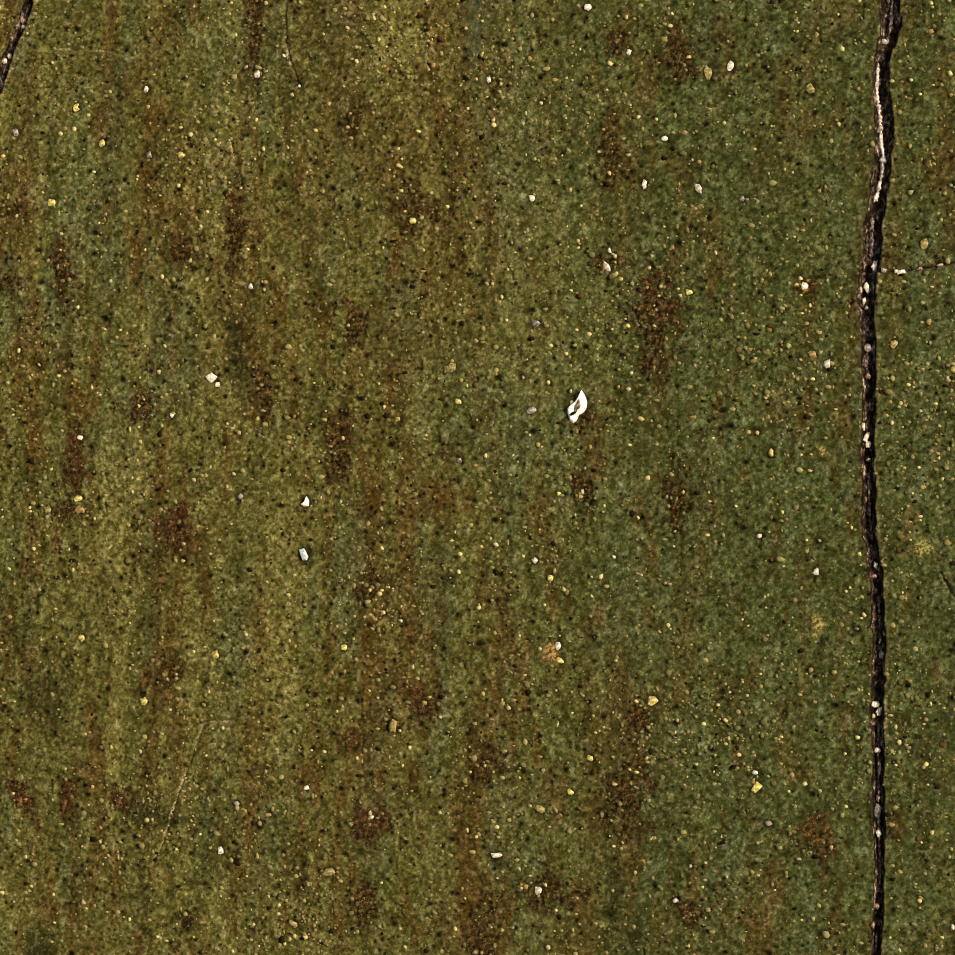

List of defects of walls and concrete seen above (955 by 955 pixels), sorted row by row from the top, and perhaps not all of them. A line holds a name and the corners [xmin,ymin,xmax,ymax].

crack [0,0,33,94]
crack [857,0,955,955]